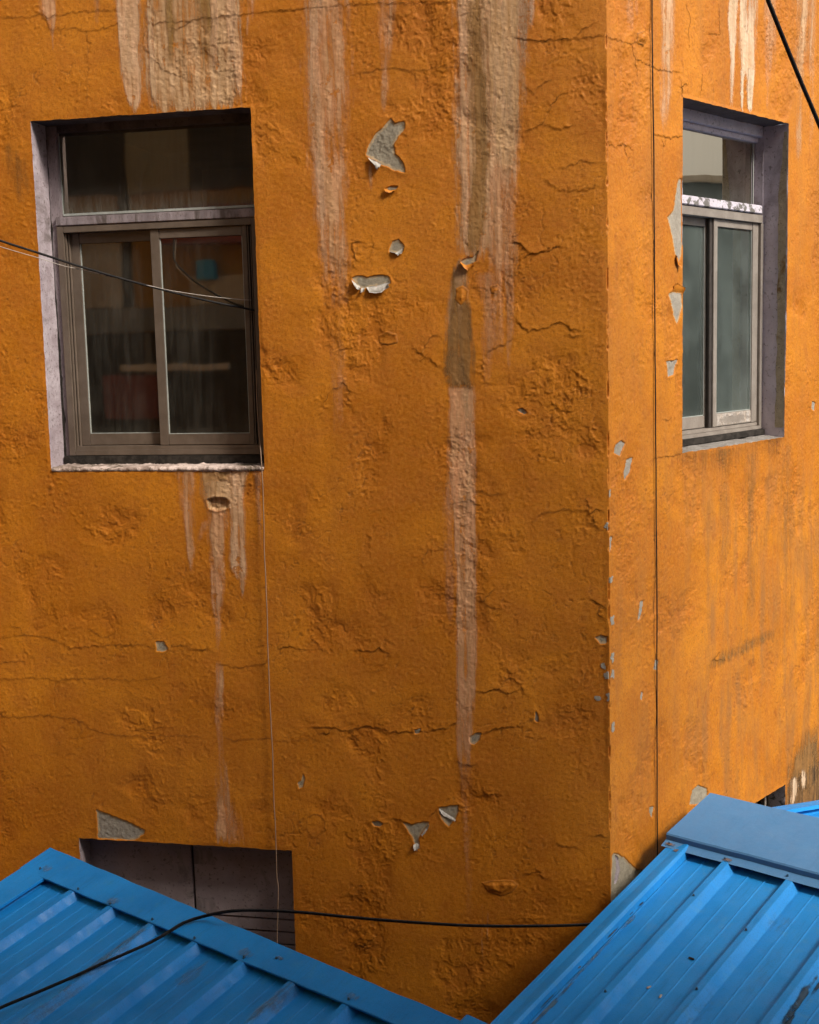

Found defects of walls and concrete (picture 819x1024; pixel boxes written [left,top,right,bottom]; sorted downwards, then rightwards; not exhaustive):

water stain [117,0,248,113]
water stain [728,0,774,110]
peeling [366,119,405,173]
peeling [667,179,683,268]
peeling [352,275,390,293]
peeling [669,283,685,323]
water stain [445,0,532,765]
peeling [614,441,632,479]
water stain [184,471,261,627]
peeling [96,810,145,840]
peeling [439,805,458,826]
peeling [611,853,642,902]